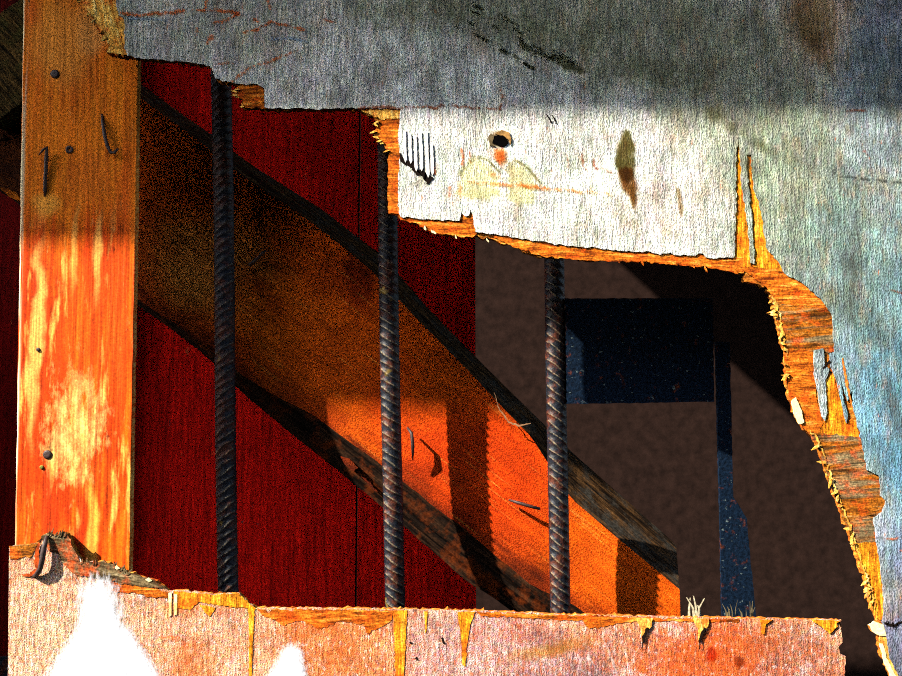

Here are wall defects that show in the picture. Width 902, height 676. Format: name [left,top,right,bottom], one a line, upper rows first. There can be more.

peeling [103,70,898,676]
crack [884,621,902,630]